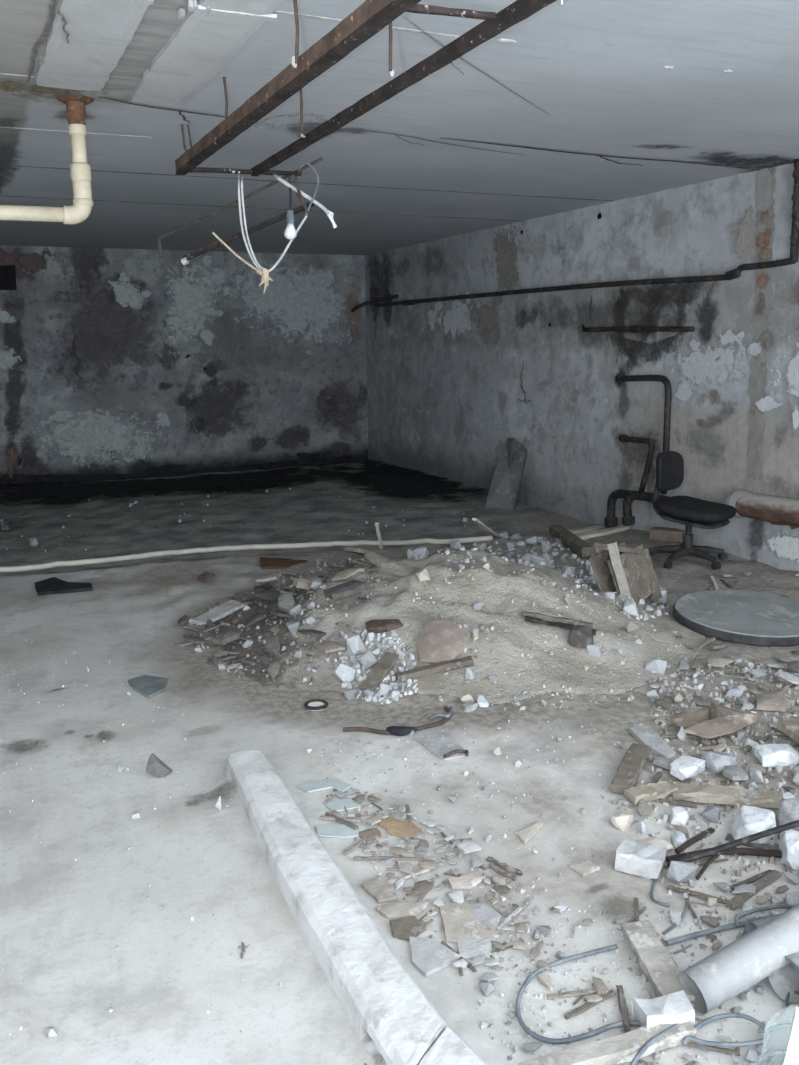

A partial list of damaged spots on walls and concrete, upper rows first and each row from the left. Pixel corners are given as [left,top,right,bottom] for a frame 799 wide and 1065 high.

crack [26,0,70,84]
corrosion [0,81,88,99]
crack [338,129,792,170]
flaking render [0,247,55,281]
leakage [369,252,409,331]
peeling [0,311,16,324]
peeling [0,346,22,372]
leakage [48,247,180,385]
leakage [517,293,660,369]
peeling [718,327,773,356]
leakage [0,299,486,505]
peeling [755,395,781,412]